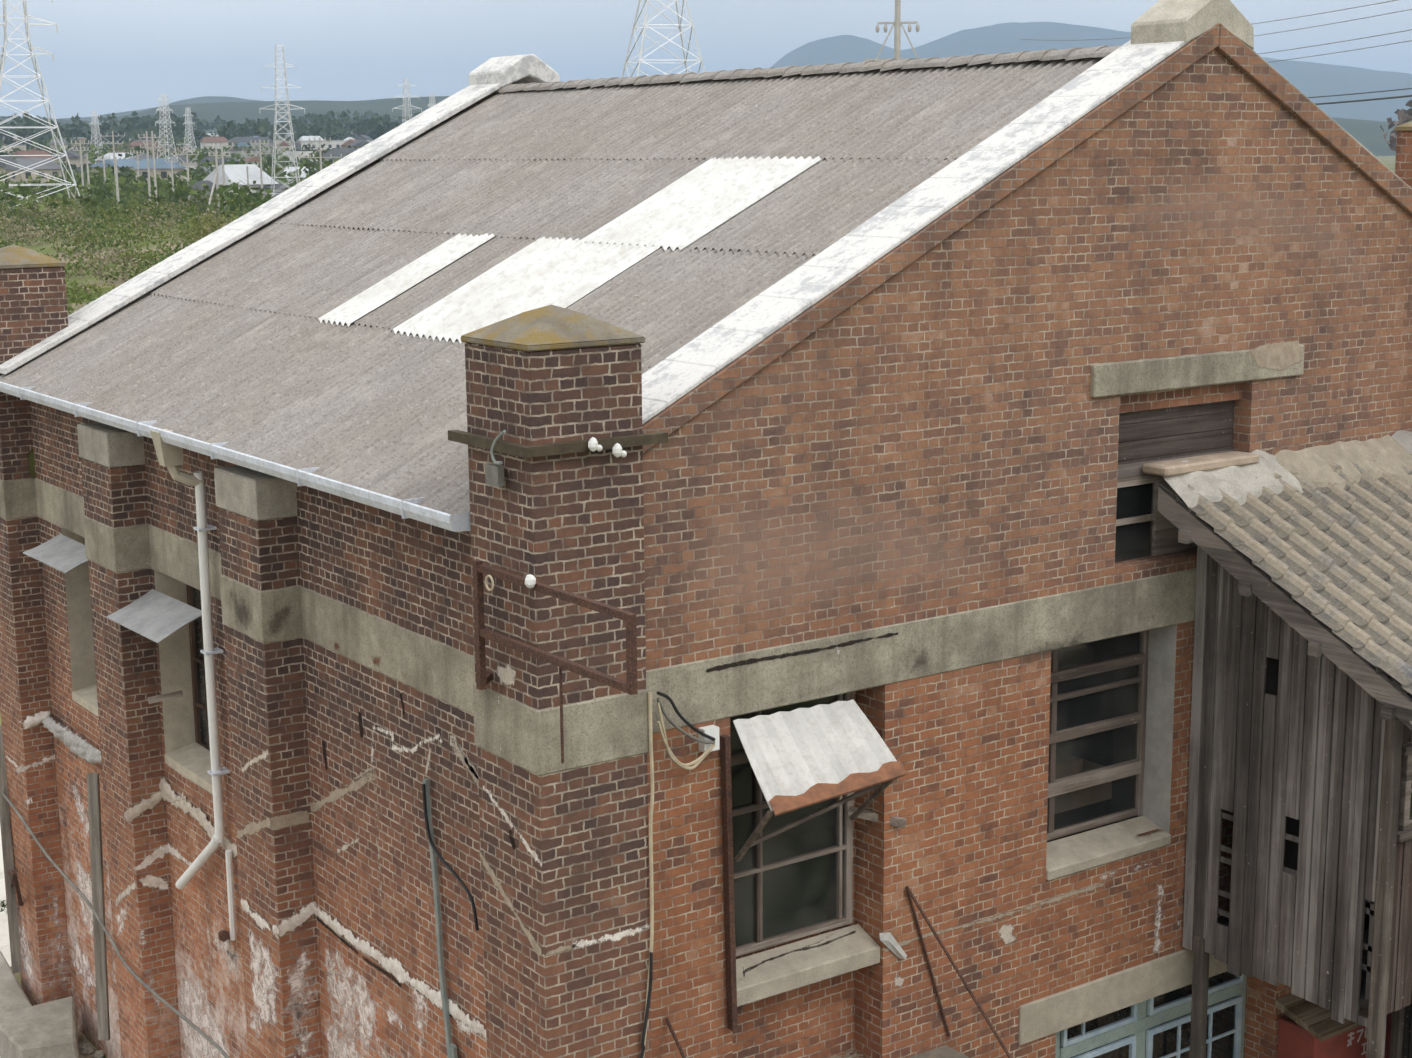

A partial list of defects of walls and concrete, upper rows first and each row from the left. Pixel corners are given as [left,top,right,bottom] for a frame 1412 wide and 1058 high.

efflorescence [72,786,89,833]
efflorescence [19,926,34,983]
efflorescence [53,861,96,987]
efflorescence [116,907,146,946]
efflorescence [179,972,229,1058]
efflorescence [215,930,427,1058]
crack [317,918,453,1018]